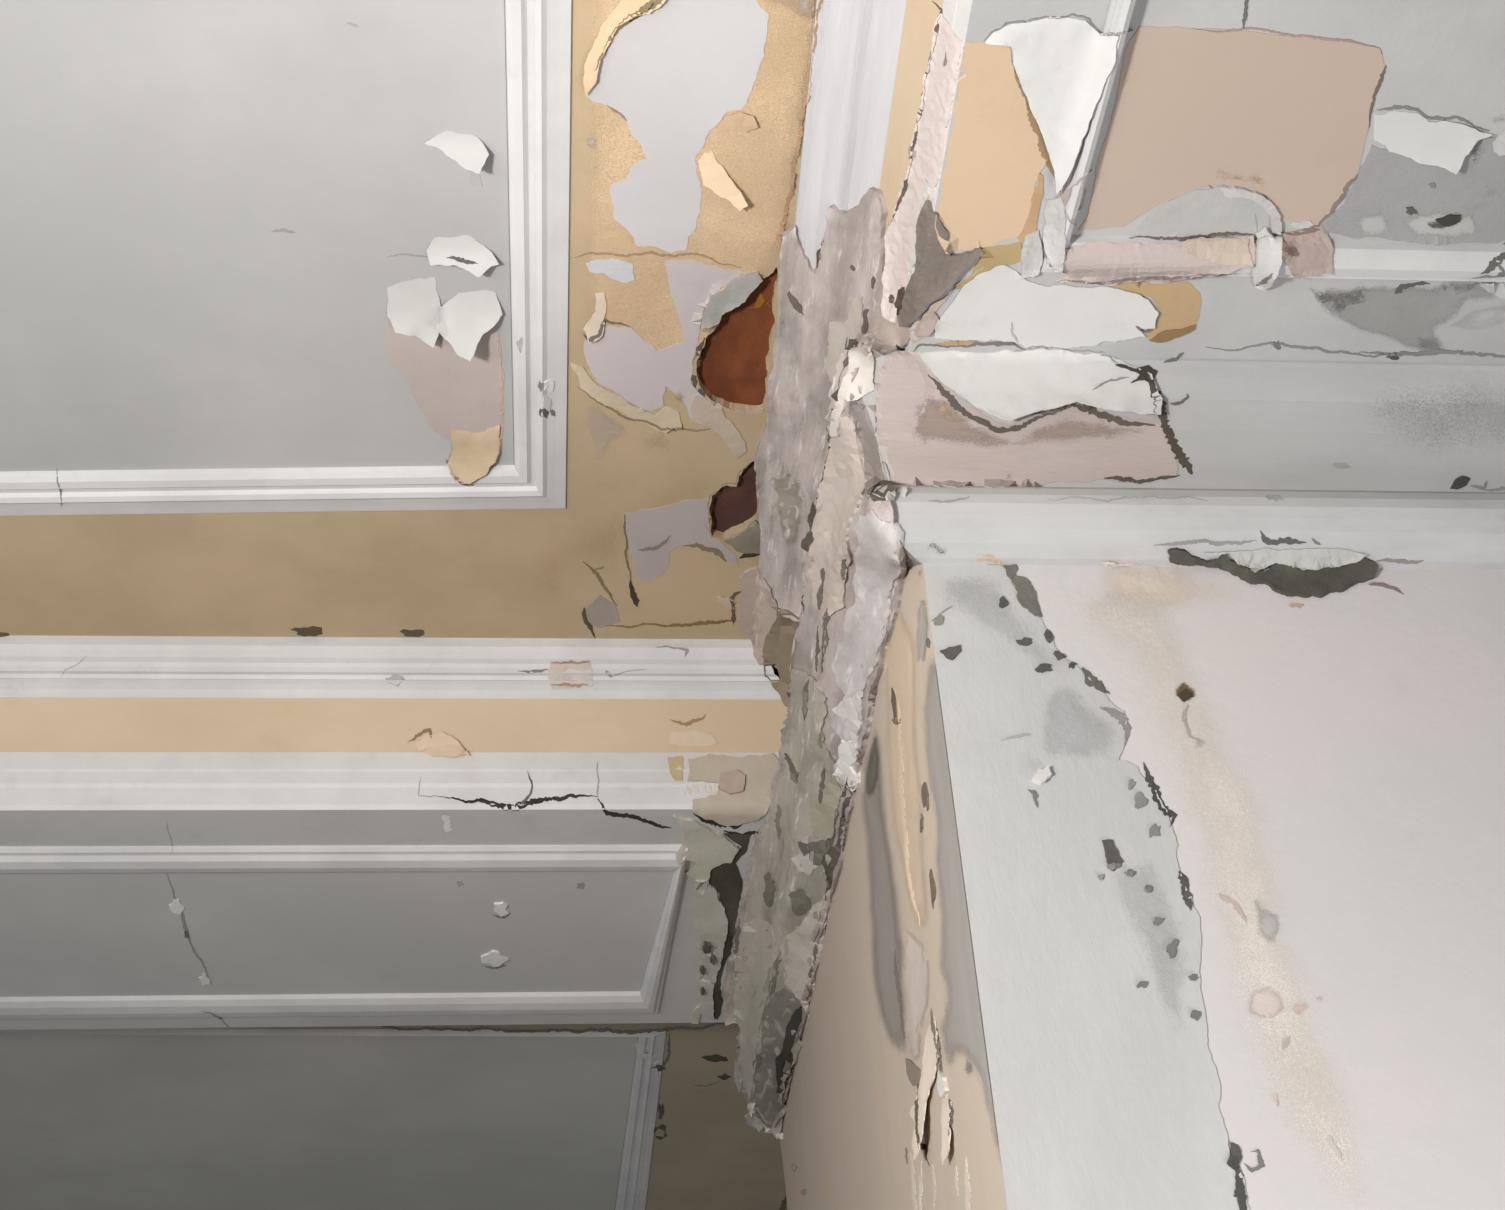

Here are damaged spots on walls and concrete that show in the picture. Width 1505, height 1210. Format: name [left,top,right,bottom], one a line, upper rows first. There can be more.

peeling [425,130,489,187]
corrosion [748,291,771,308]
peeling [385,235,523,486]
peeling [538,380,555,418]
flaking render [567,0,1505,1210]
peeling [408,728,469,757]
crack [418,762,761,835]
damp [999,531,1424,1210]
crack [166,826,229,1027]